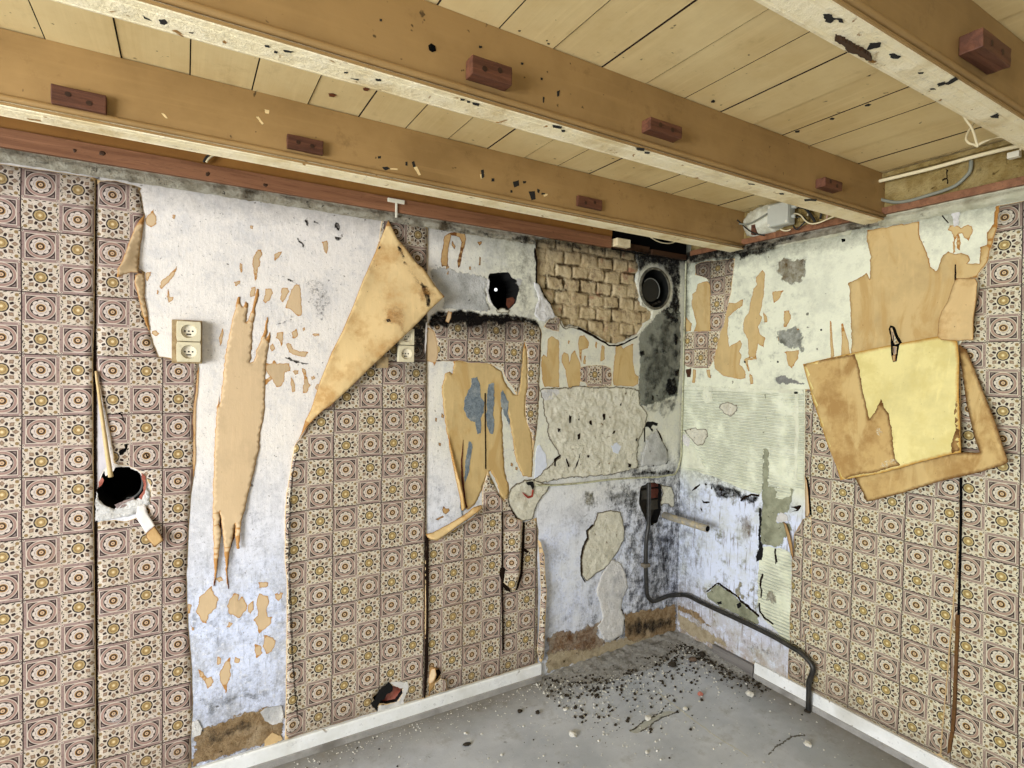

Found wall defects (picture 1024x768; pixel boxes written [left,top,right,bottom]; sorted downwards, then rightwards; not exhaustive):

peeling [117,209,177,336]
peeling [234,220,445,447]
spalling [534,239,651,344]
damp [512,233,806,416]
spalling [777,258,806,285]
peeling [937,278,978,341]
damp [711,483,757,503]
damp [659,536,669,581]
peeling [188,577,283,658]
damp [623,604,711,641]
spalling [371,682,408,712]
flaking render [191,705,285,767]